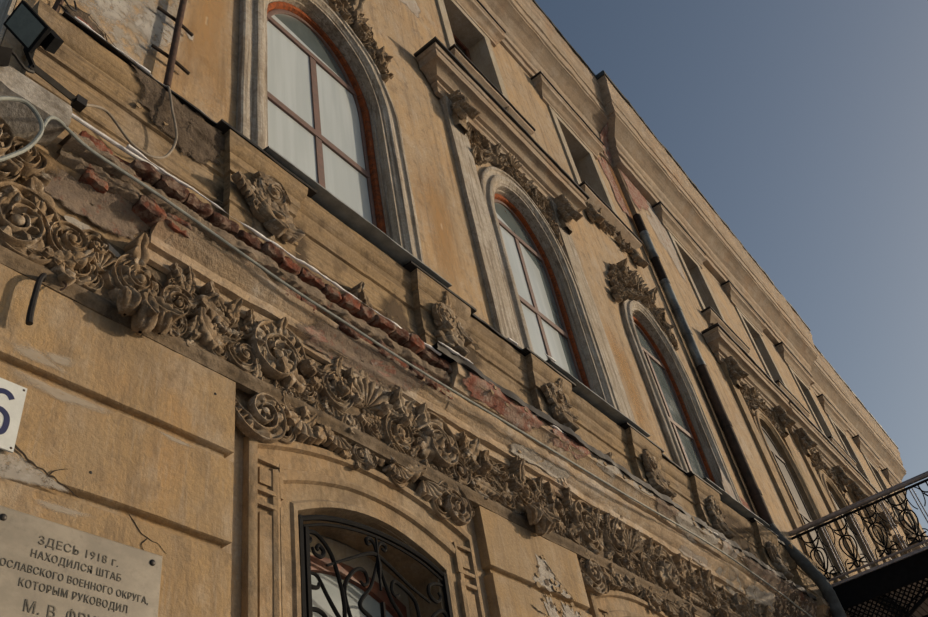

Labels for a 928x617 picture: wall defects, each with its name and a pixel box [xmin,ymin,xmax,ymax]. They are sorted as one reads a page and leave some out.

flaking render [64,0,180,63]
flaking render [597,123,671,257]
flaking render [56,131,453,400]
flaking render [510,444,570,485]
flaking render [550,428,653,496]
crack [129,514,164,551]
flaking render [532,555,581,617]
spalling [675,512,832,617]